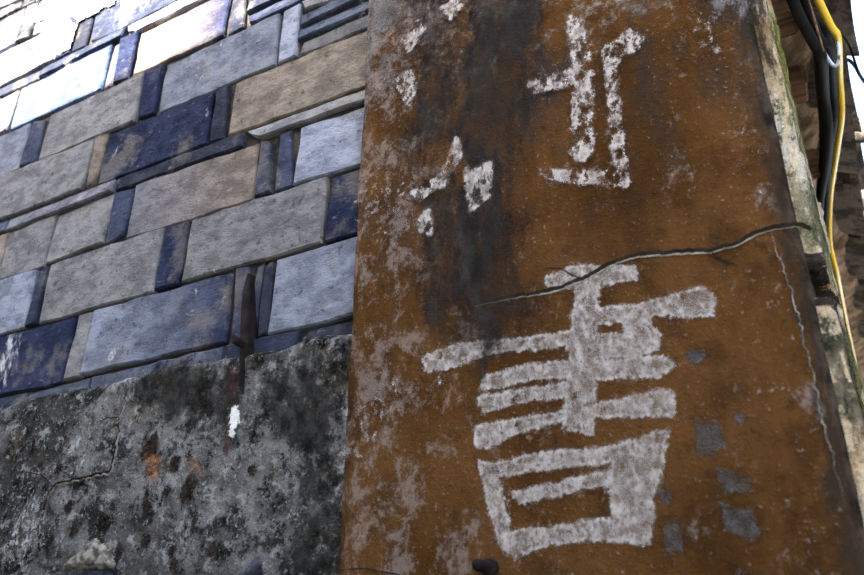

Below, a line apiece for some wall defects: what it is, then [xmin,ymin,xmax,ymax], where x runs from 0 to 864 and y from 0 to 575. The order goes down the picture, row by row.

peeling [34,0,115,55]
peeling [710,0,753,21]
leakage [767,5,864,507]
corrosion [218,366,240,455]
spalling [140,431,159,463]
spalling [168,449,194,473]
spalling [141,479,197,519]
spalling [63,500,79,538]
spalling [57,511,122,575]
spalling [140,532,153,551]
spalling [167,540,179,573]
spalling [239,556,267,575]